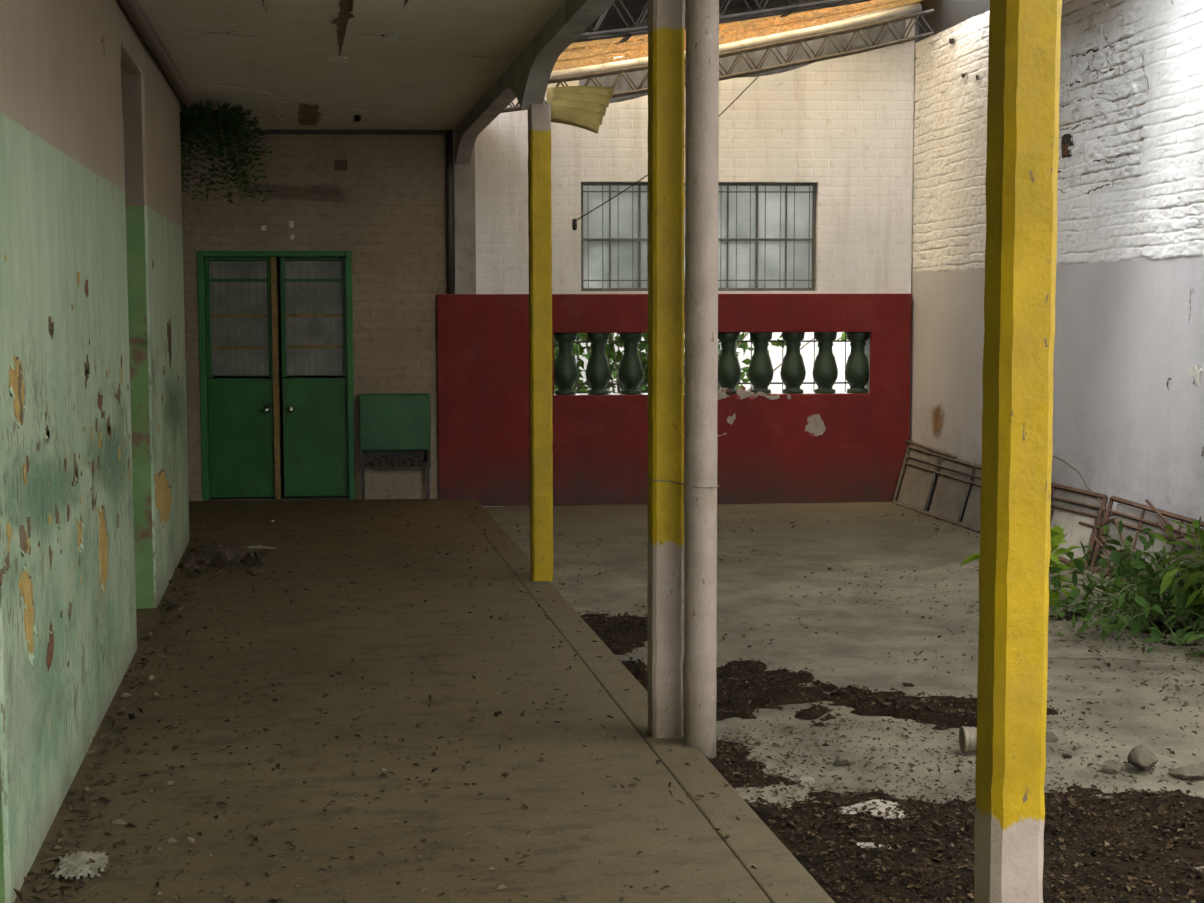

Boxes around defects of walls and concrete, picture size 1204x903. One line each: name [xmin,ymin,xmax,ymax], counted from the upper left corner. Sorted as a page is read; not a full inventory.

crack [1059,29,1149,130]
crack [1058,153,1126,194]
peeling [717,386,791,437]
peeling [805,413,826,437]
peeling [0,339,130,672]
peeling [154,458,174,529]